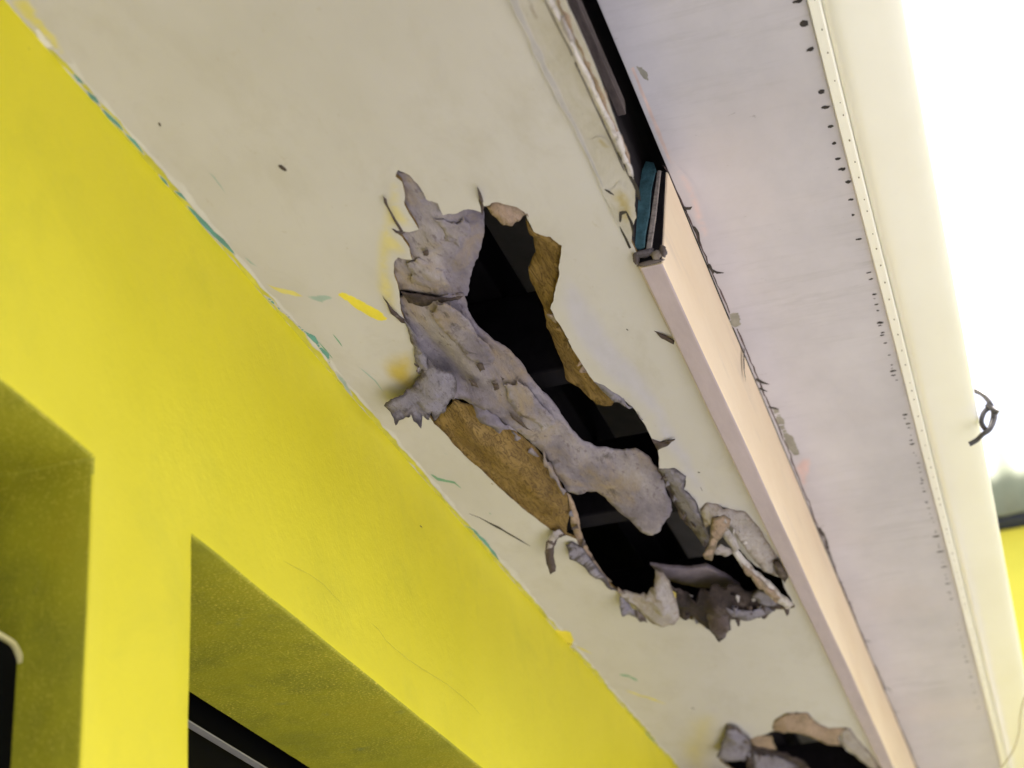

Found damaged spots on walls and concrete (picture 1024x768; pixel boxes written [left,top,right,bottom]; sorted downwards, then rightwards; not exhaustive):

peeling [729,311,742,329]
peeling [772,408,801,458]
peeling [619,596,648,623]
peeling [726,589,779,621]